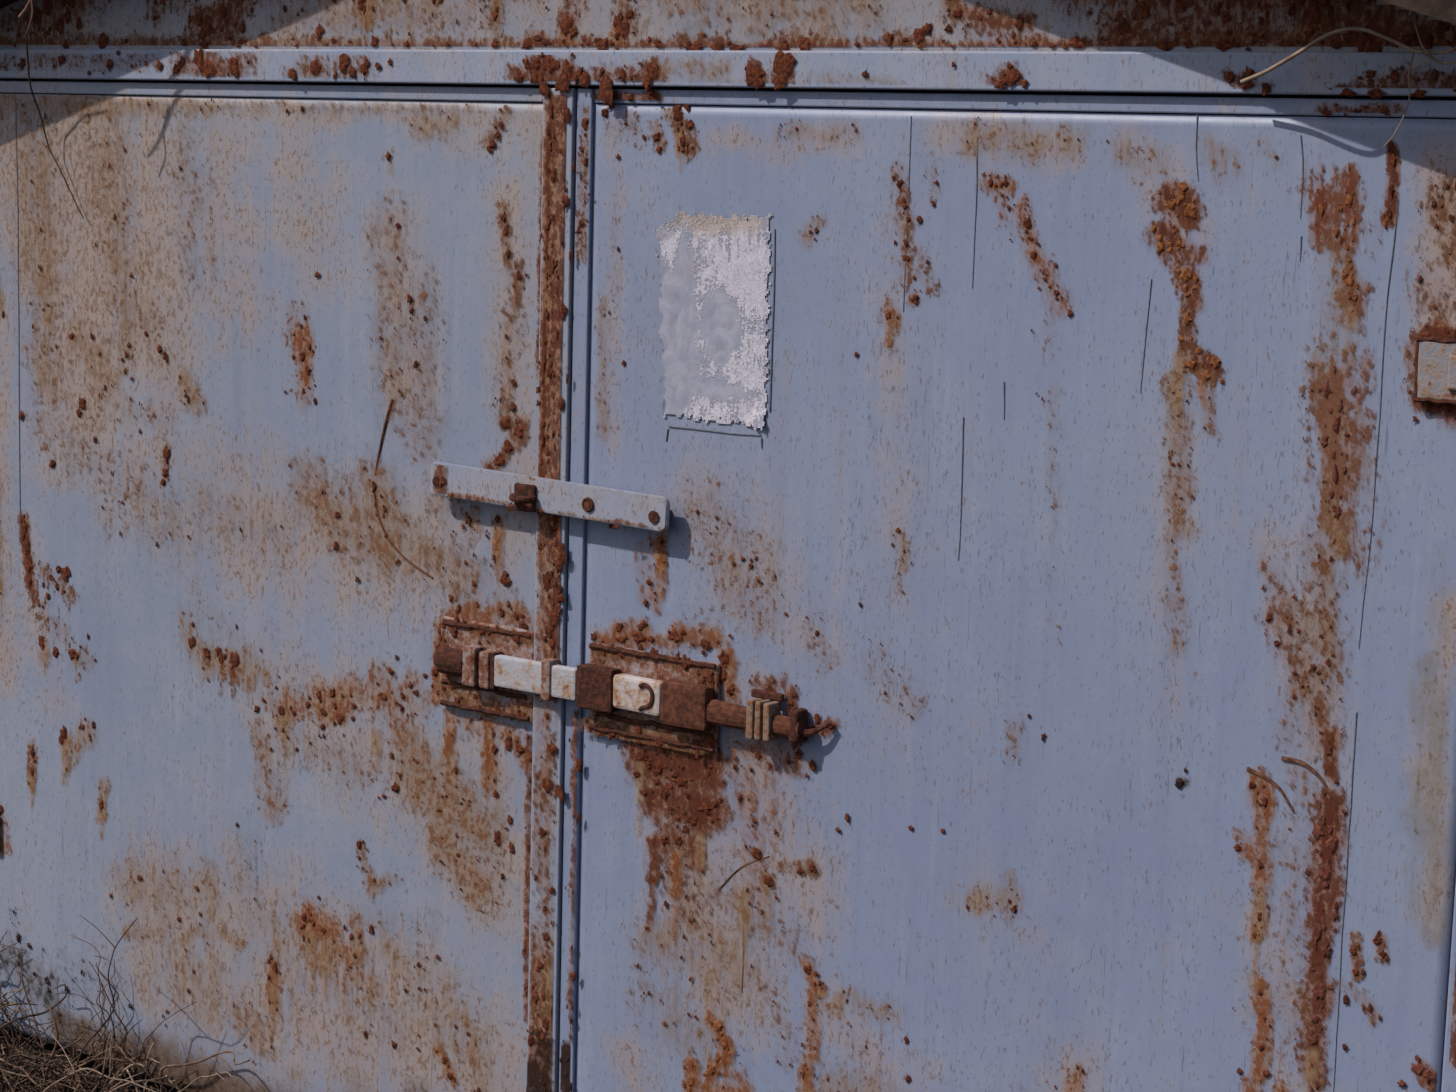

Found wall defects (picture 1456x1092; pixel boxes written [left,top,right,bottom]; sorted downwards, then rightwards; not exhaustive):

rust [1314,64,1456,116]
rust [0,0,1412,480]
rust [1106,139,1225,659]
rust [0,95,912,1092]
rust [863,639,932,719]
rust [966,875,1021,921]
rust [1054,1063,1088,1092]